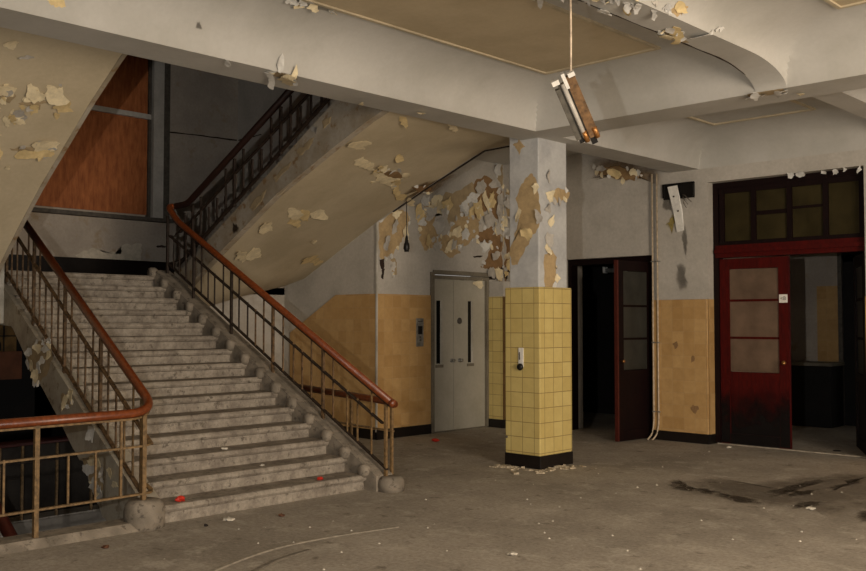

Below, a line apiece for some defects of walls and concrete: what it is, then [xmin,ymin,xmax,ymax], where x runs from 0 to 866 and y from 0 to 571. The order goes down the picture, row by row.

peeling [561,0,725,44]
peeling [264,53,298,90]
peeling [0,83,73,136]
peeling [0,141,60,170]
peeling [287,208,328,228]
peeling [347,141,570,287]
peeling [24,337,53,387]
flaking render [82,454,118,499]